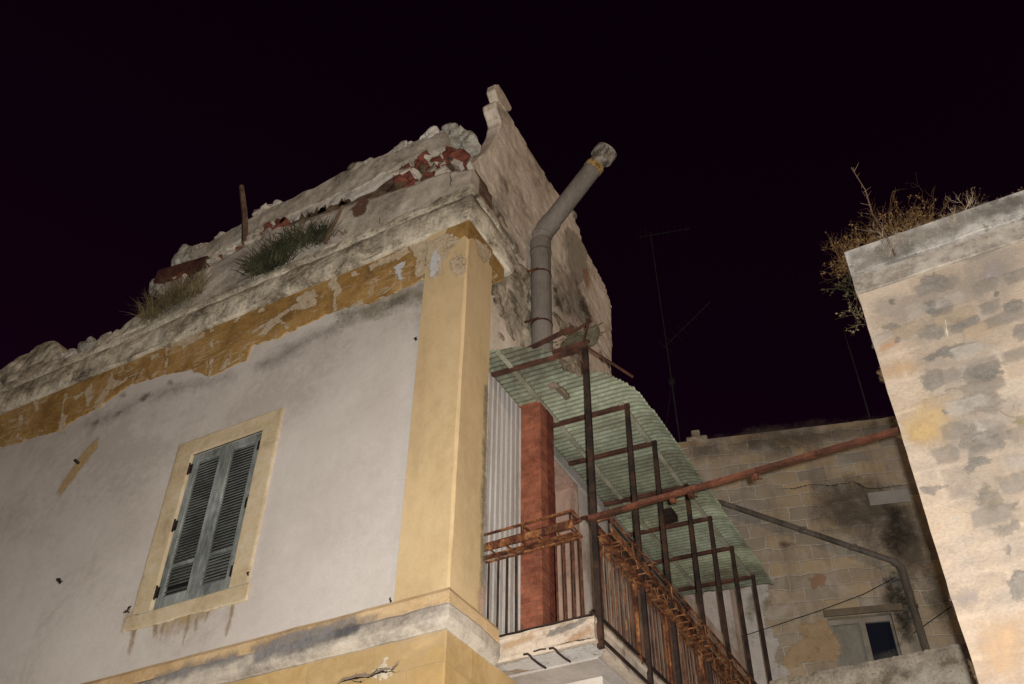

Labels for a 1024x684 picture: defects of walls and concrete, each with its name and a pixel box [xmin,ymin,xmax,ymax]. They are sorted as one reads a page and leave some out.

flaking render [289,146,475,226]
peeling [351,233,467,280]
peeling [251,276,342,336]
peeling [57,371,132,433]
crack [779,481,904,489]
damp [252,617,374,660]
flaking render [372,656,396,681]
spalling [497,638,605,672]